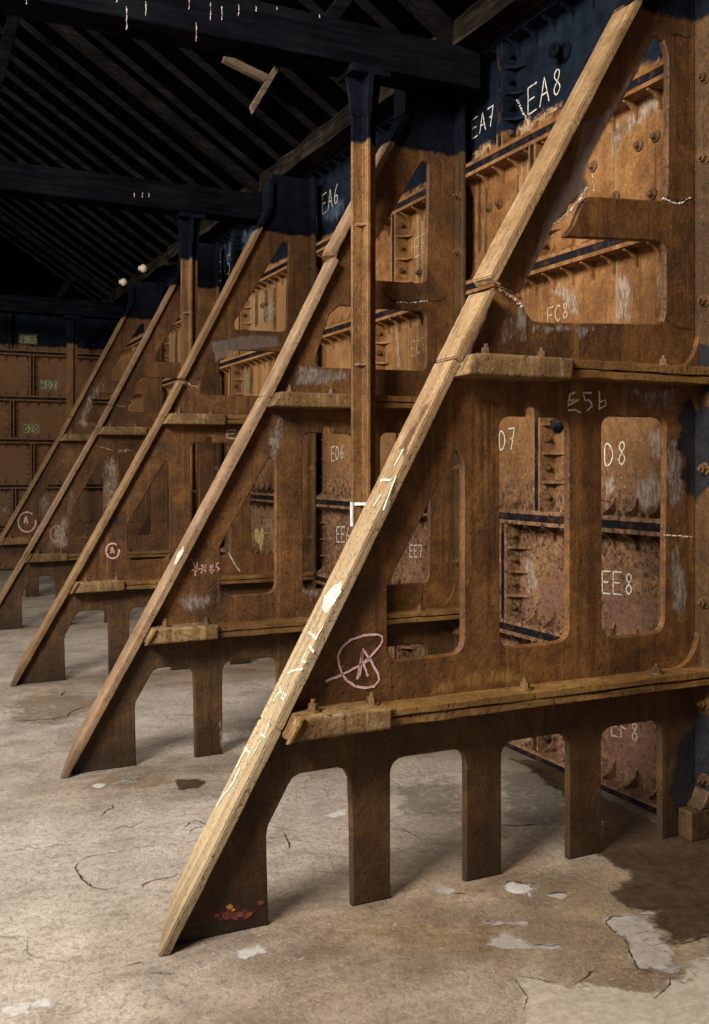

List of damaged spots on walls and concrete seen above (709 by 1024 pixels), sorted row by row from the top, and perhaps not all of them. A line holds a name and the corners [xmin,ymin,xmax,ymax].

water stain [85,773,205,790]
crack [0,804,149,889]
spalling [503,880,532,896]
water stain [596,795,709,945]
spalling [483,921,563,950]
spalling [515,911,709,1024]